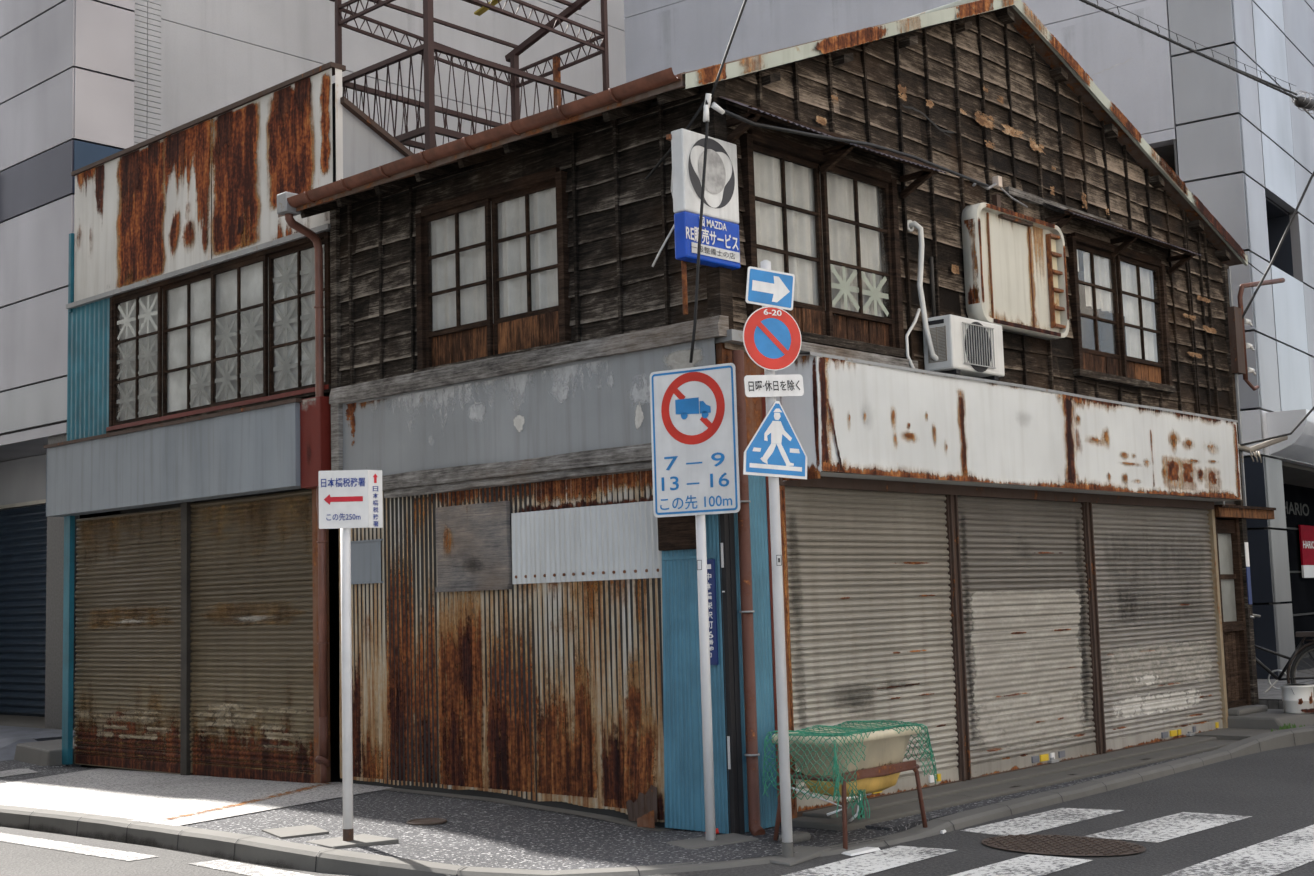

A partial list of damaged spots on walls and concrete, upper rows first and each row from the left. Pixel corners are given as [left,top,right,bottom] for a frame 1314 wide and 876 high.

corrosion [697,55,761,85]
corrosion [815,17,921,54]
corrosion [77,73,330,288]
corrosion [964,204,1069,337]
corrosion [414,470,653,536]
corrosion [781,355,1241,731]
corrosion [352,558,664,820]
corrosion [75,698,331,819]